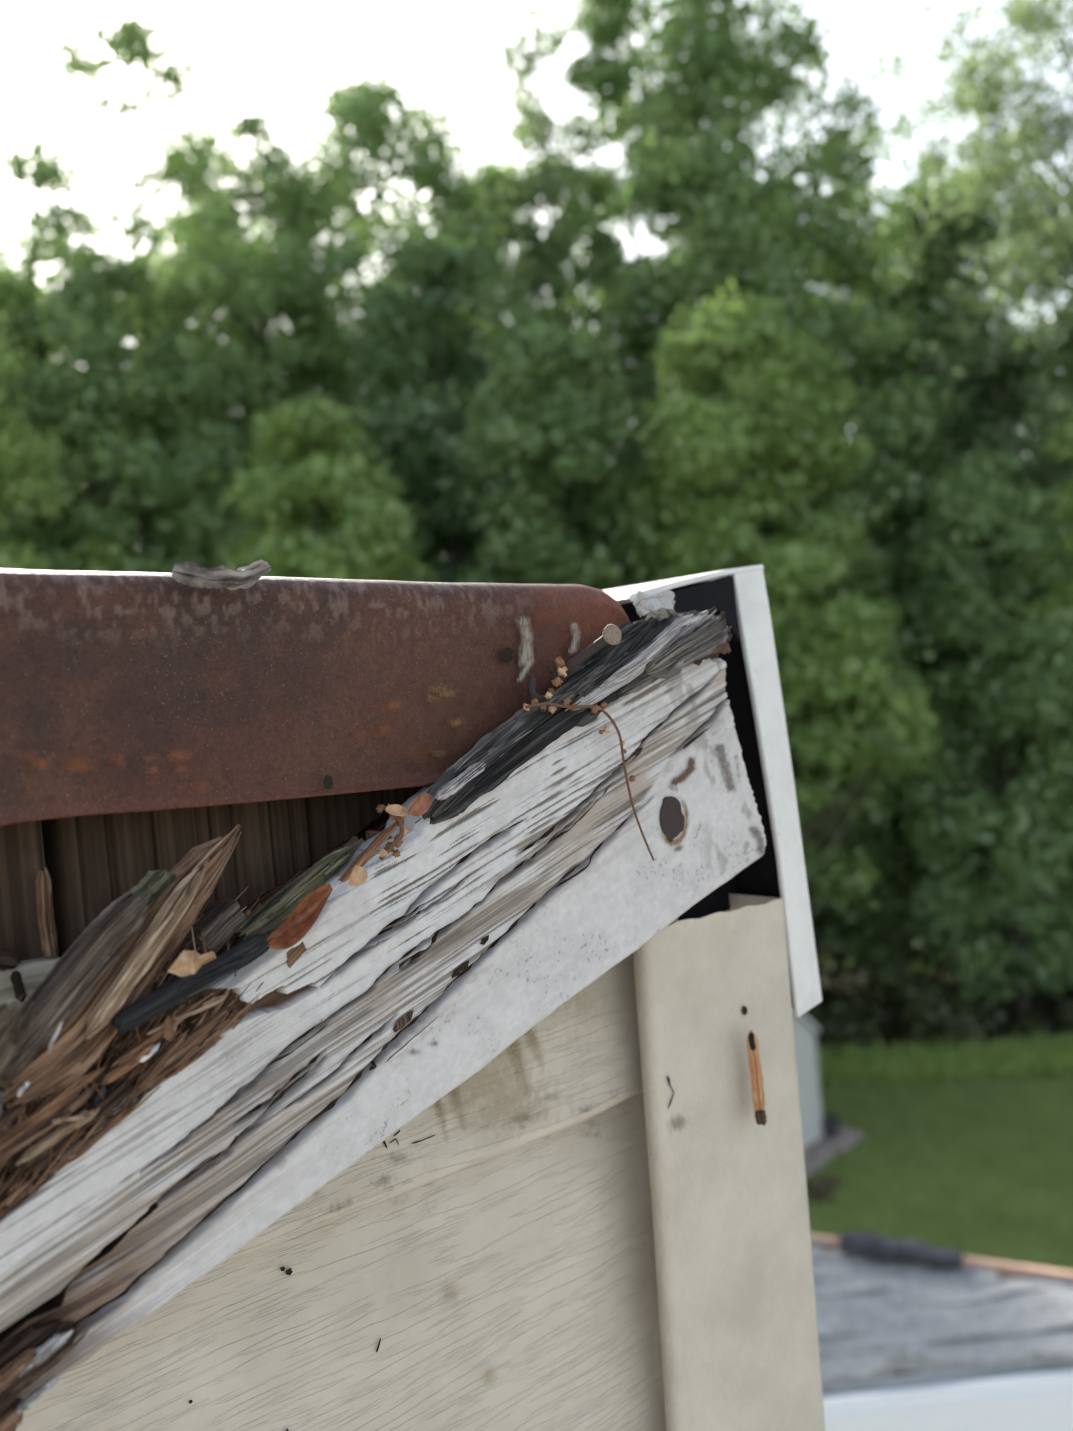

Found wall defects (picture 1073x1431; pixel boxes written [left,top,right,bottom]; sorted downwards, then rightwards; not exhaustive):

peeling [671,757,695,789]
peeling [716,745,734,790]
peeling [751,827,765,853]
peeling [452,960,469,978]
peeling [10,971,27,1002]
peeling [393,1010,414,1032]